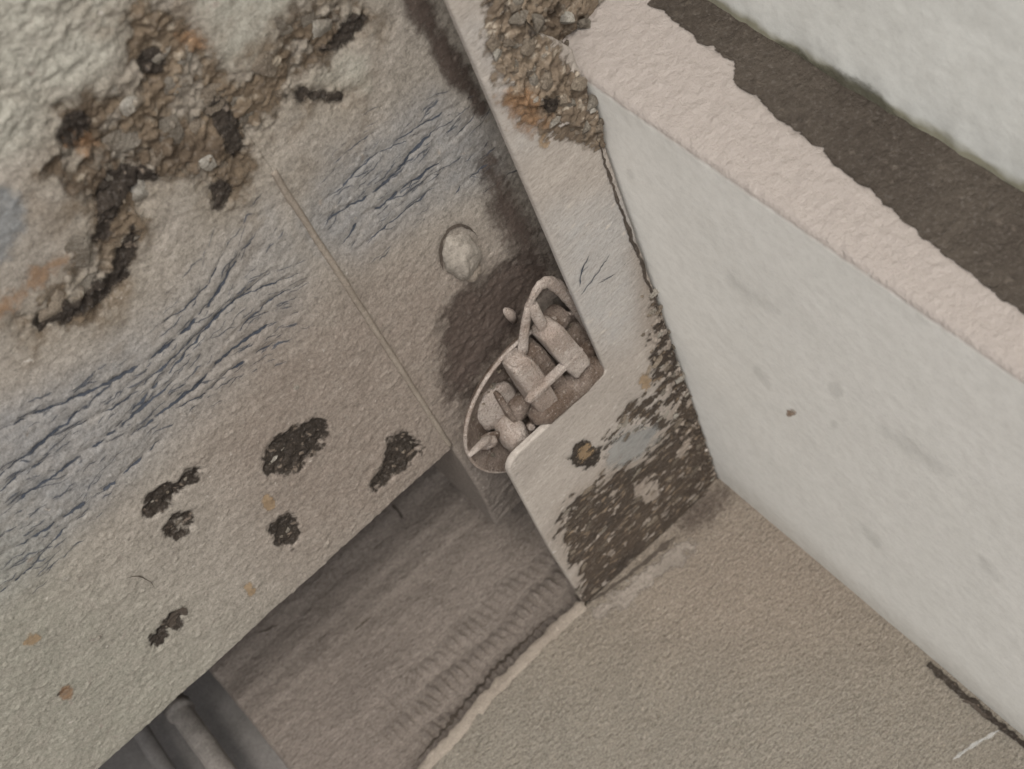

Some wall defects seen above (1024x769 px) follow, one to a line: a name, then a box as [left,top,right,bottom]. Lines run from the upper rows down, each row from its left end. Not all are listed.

peeling [479,0,606,152]
spalling [32,0,370,332]
crack [319,91,517,262]
crack [0,195,307,593]
water stain [439,255,548,402]
crack [579,254,625,294]
peeling [553,288,717,602]
crack [926,661,1024,748]